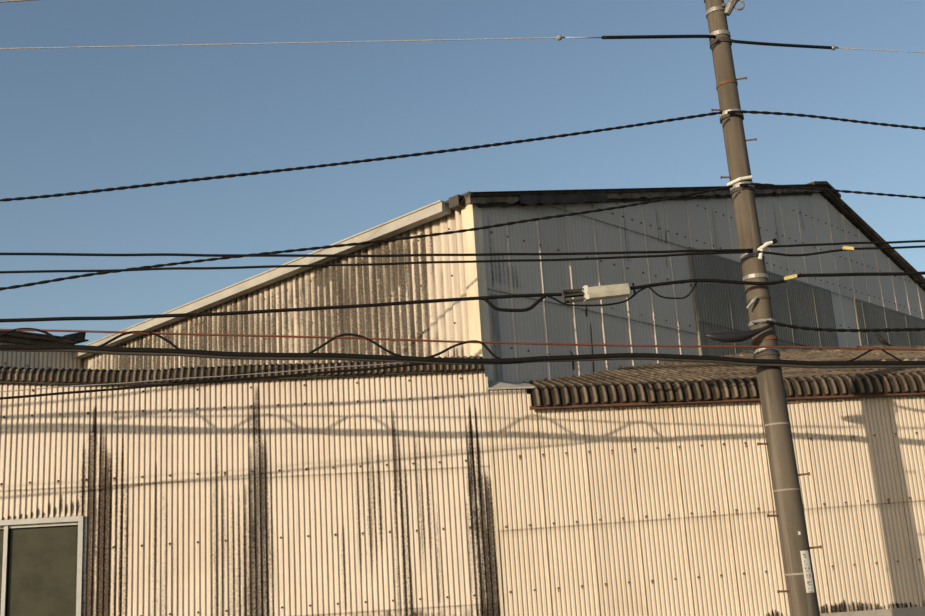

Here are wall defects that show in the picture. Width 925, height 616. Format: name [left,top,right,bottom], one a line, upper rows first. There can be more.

leakage [94,229,438,371]
leakage [2,407,123,616]
leakage [216,469,224,616]
leakage [239,387,274,616]
leakage [358,458,382,557]
leakage [392,415,422,616]
leakage [467,409,504,616]
leakage [821,600,925,613]